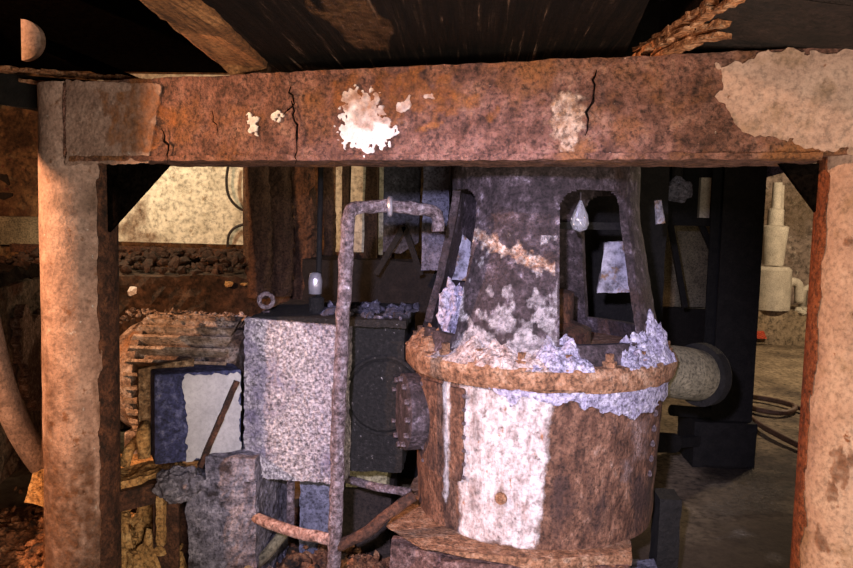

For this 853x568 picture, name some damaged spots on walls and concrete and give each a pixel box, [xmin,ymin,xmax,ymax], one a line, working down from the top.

crack [283,86,299,163]
crack [585,69,597,136]
peeling [715,47,853,155]
corrosion [790,157,830,568]
corrosion [831,450,852,492]